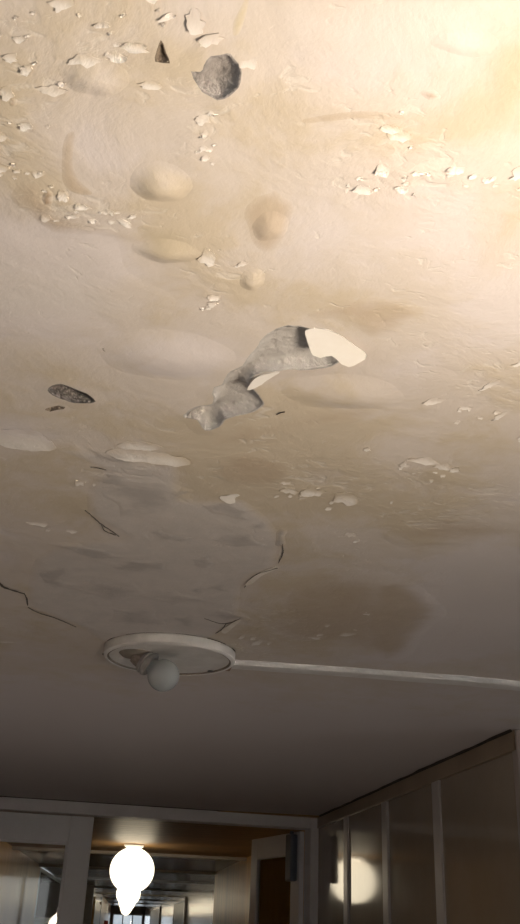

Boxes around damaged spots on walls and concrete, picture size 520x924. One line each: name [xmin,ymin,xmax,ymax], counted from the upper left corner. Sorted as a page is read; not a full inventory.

peeling [47,0,81,18]
spalling [68,0,265,165]
spalling [33,376,110,414]
spalling [167,314,367,436]
peeling [398,457,460,483]
crack [85,510,119,537]
crack [0,583,76,627]
damp [242,565,447,661]